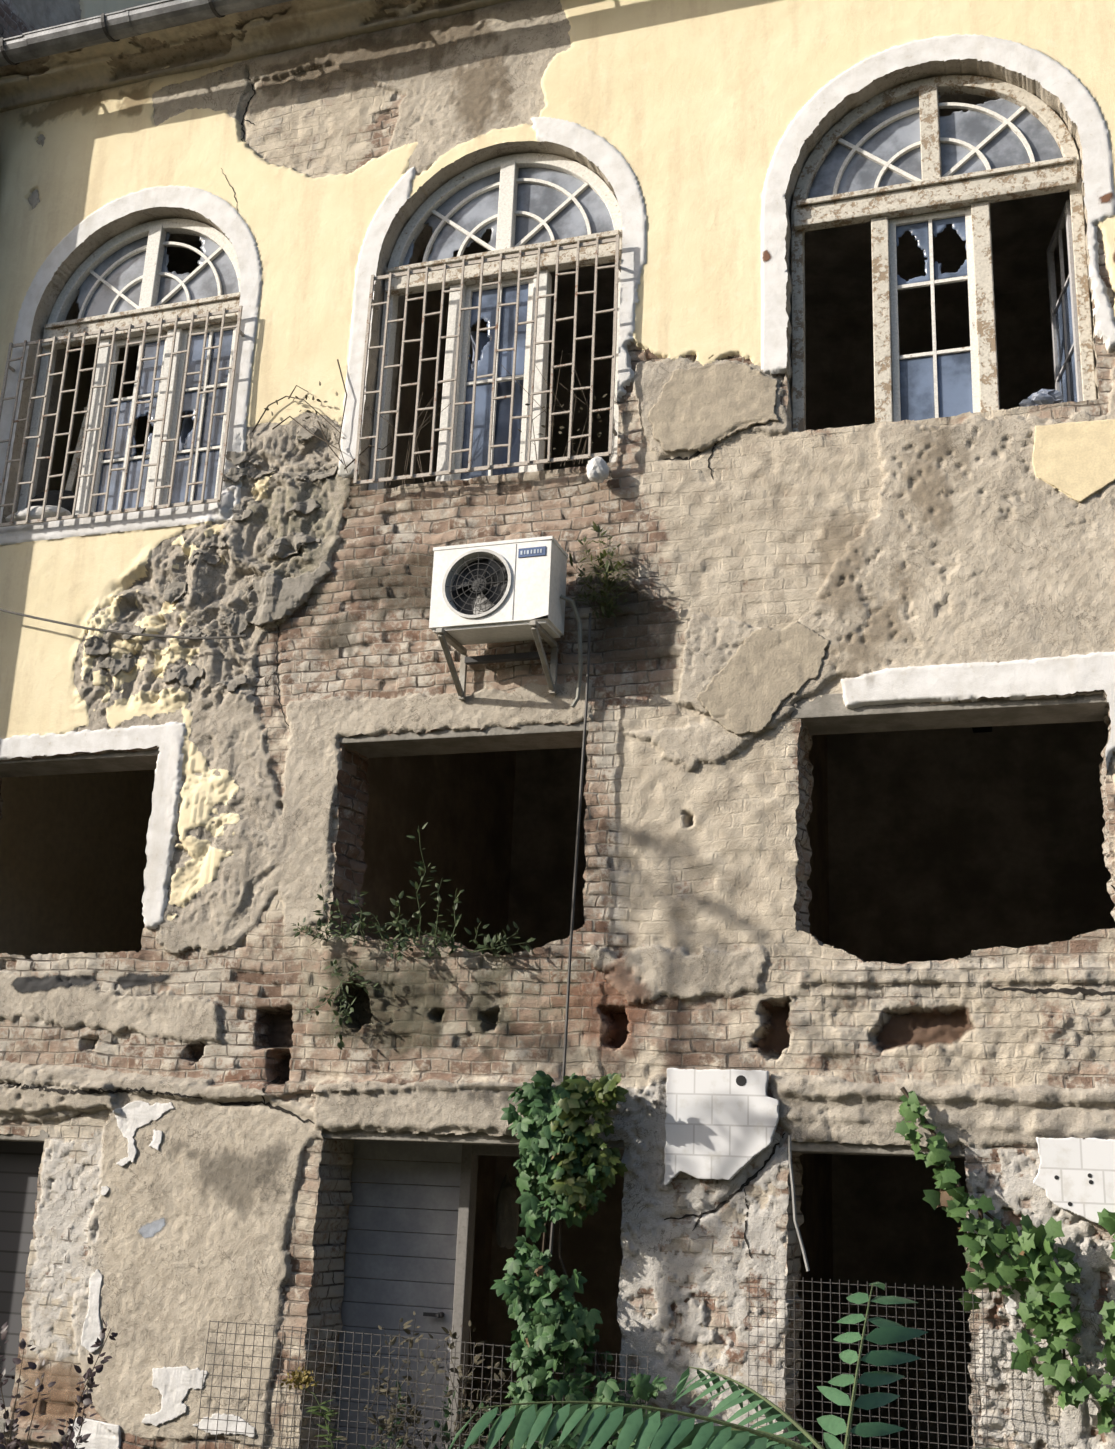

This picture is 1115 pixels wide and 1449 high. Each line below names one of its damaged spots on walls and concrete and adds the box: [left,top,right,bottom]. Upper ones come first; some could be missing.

spalling [0,56,49,80]
spalling [0,0,82,39]
spalling [107,0,571,179]
spalling [0,345,1115,1449]
crack [991,986,1115,996]
crack [664,1133,785,1259]